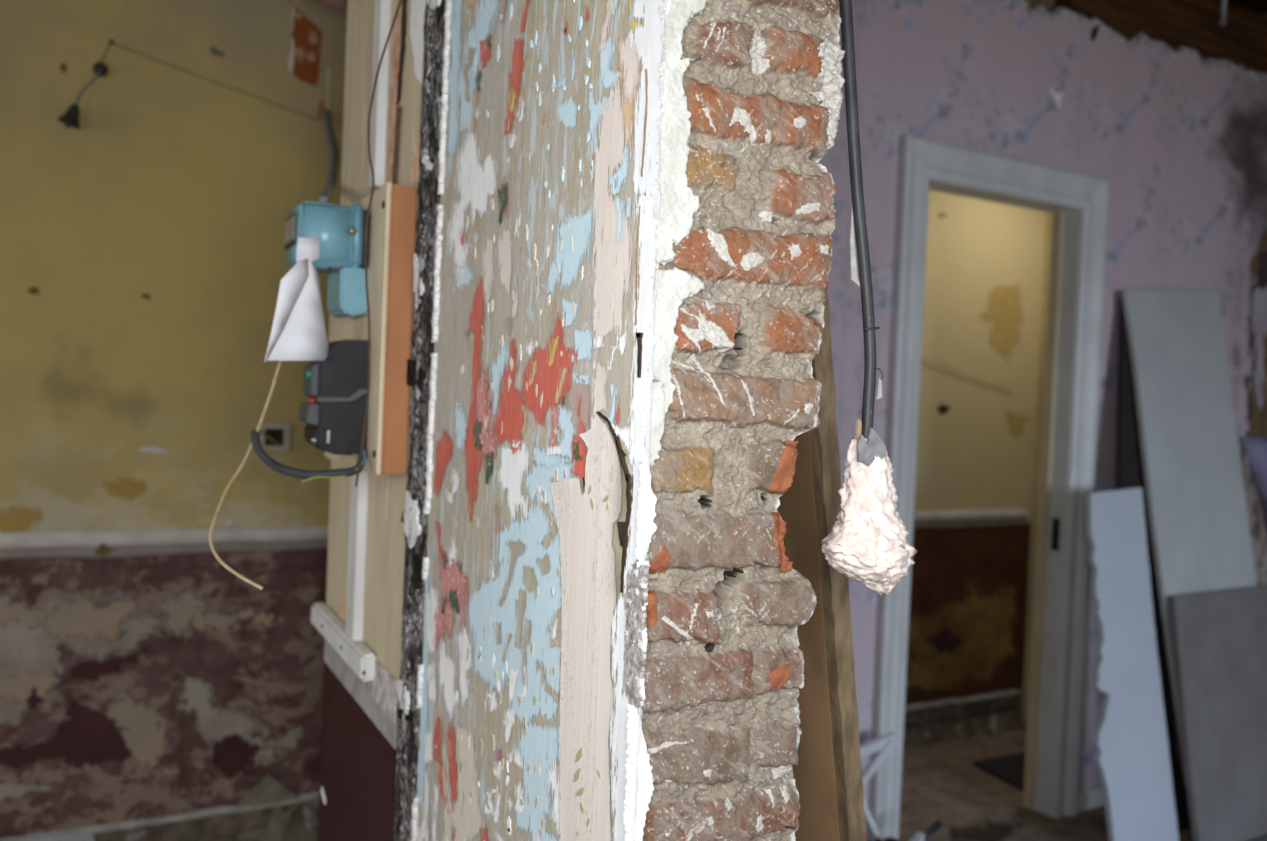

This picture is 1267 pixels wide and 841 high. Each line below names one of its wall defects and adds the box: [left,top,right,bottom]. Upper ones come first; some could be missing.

peeling [447,107,498,291]
damp [1224,115,1267,207]
peeling [403,468,461,567]
peeling [497,440,543,523]
crack [596,411,633,593]
flaking render [623,0,842,841]
peeling [1241,220,1267,587]
peeling [0,582,299,728]
peeling [103,669,304,776]
peeling [417,584,472,841]
peeling [903,578,1024,749]
flaking render [94,800,319,841]